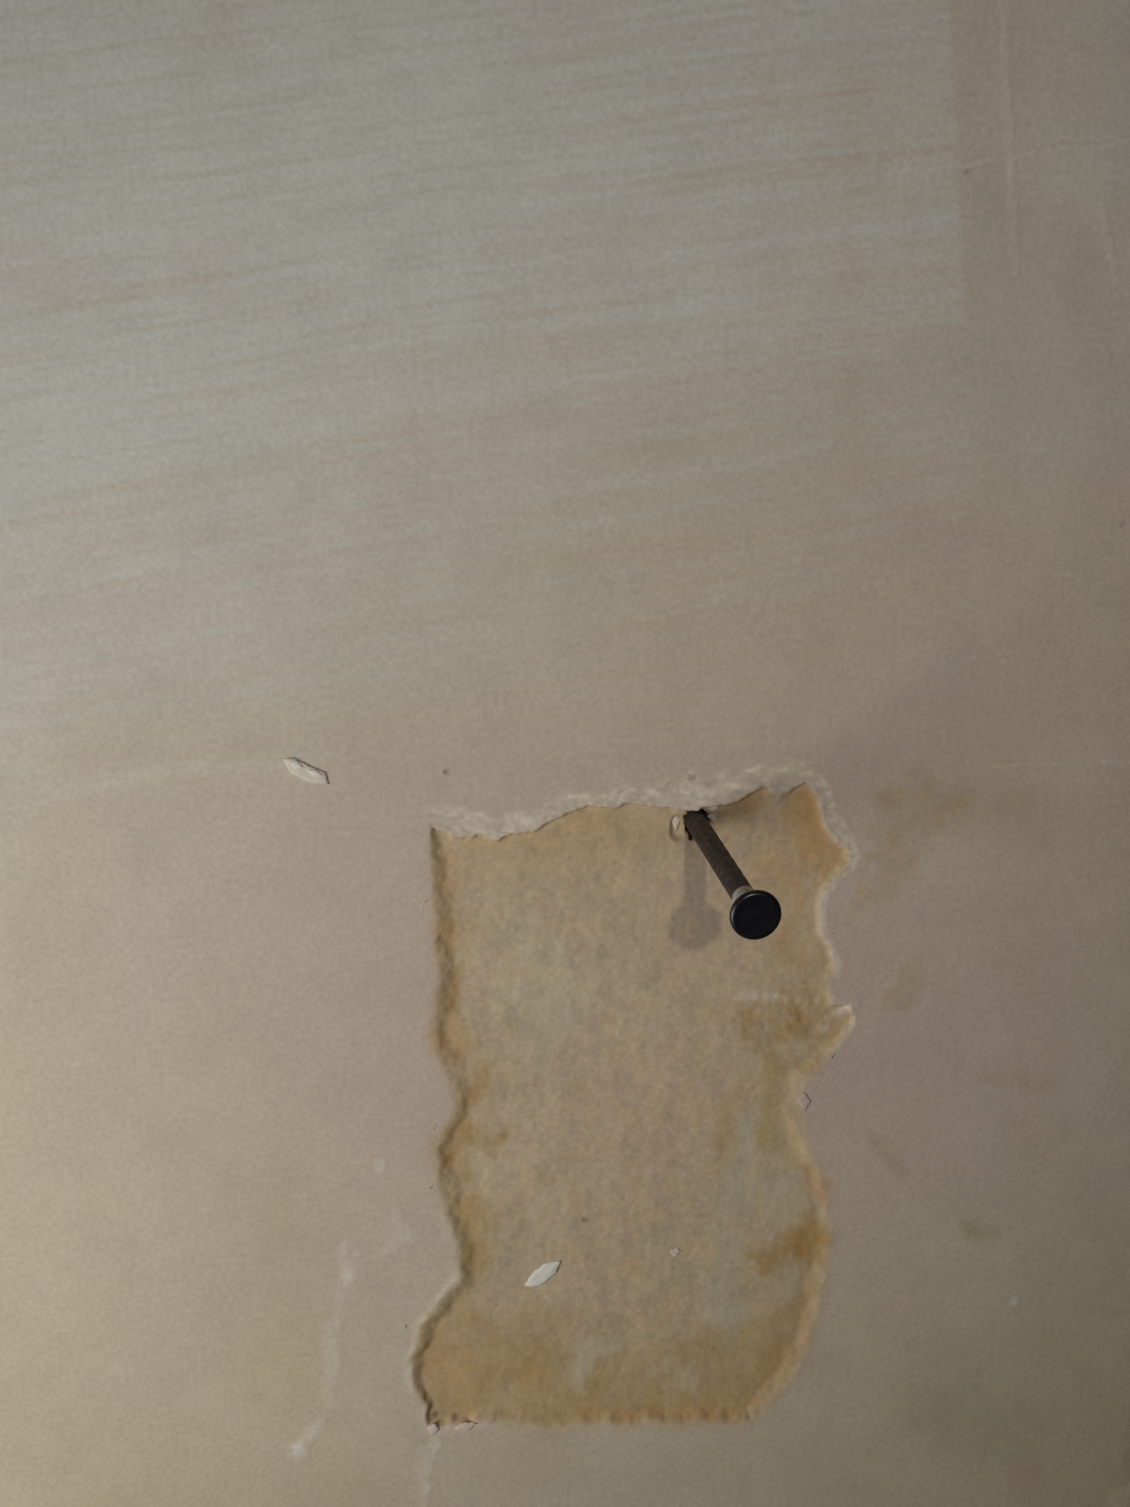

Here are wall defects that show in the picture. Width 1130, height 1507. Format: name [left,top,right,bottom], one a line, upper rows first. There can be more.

peeling [399,753,862,1440]